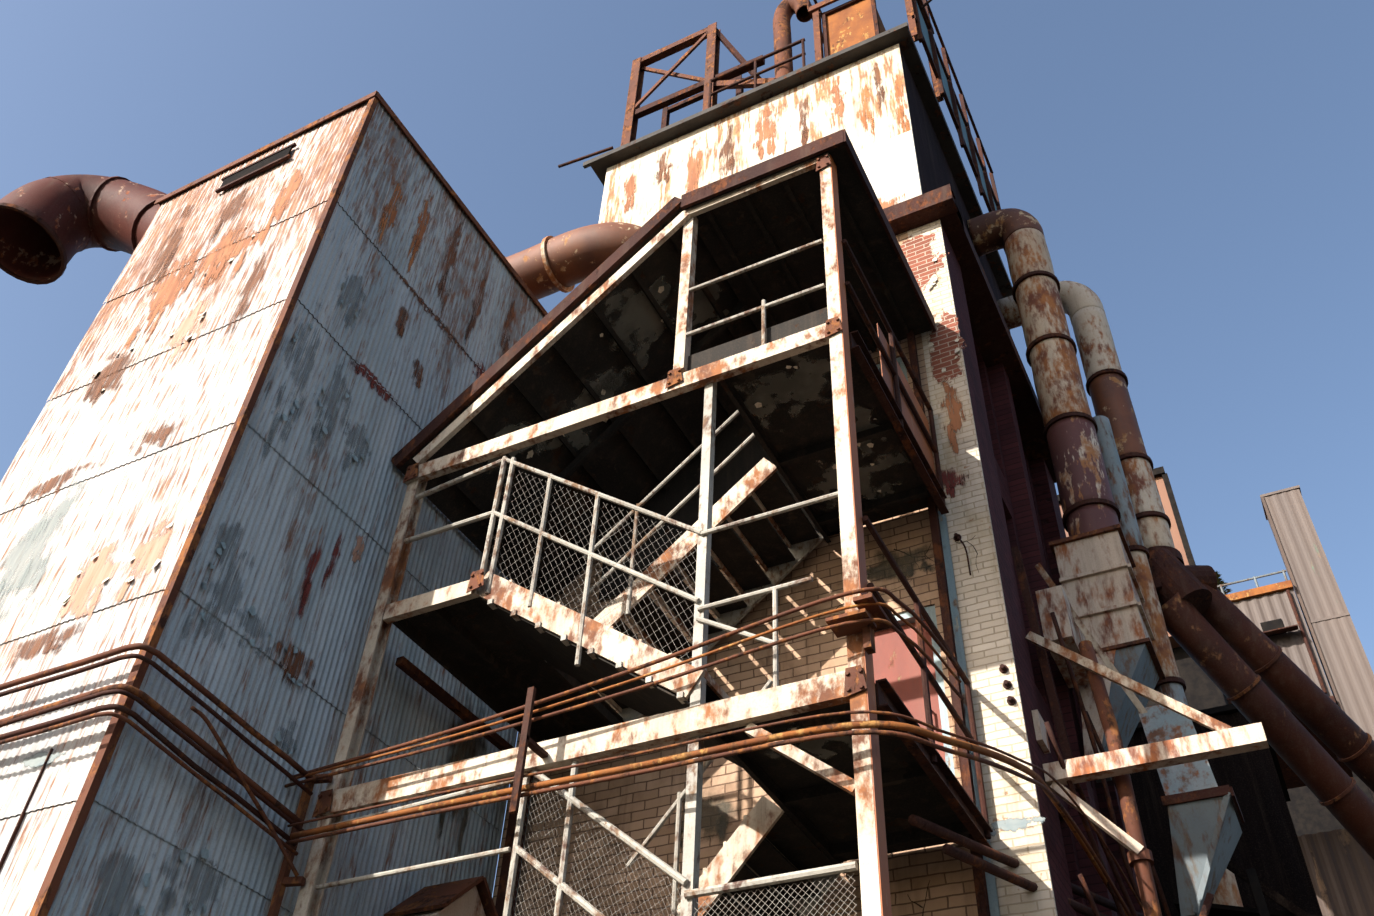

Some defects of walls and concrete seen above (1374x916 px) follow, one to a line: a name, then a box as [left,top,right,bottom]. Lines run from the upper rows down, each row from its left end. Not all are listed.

corrosion [124,189,248,349]
corrosion [225,169,303,337]
corrosion [393,196,486,378]
peeling [900,229,949,291]
corrosion [351,361,397,402]
corrosion [413,358,423,388]
corrosion [500,300,515,355]
peeling [927,311,967,384]
corrosion [130,422,175,456]
peeling [59,520,176,620]
corrosion [298,533,365,618]
corrosion [10,623,83,668]